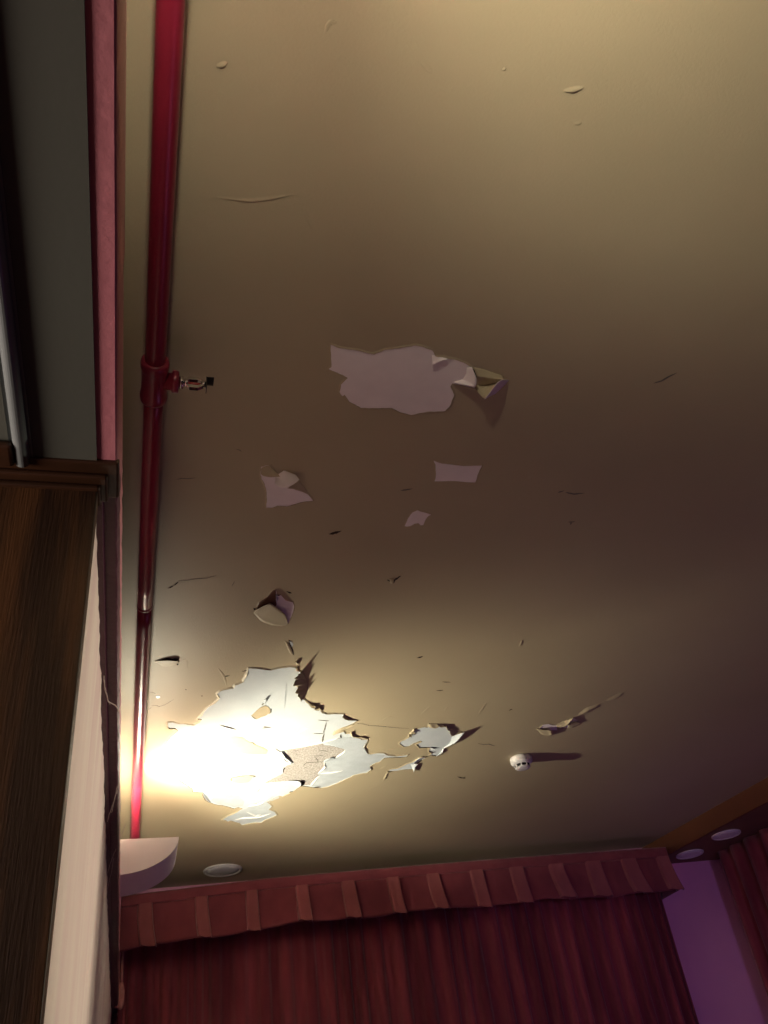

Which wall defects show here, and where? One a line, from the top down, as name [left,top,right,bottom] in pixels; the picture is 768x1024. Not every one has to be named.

peeling [327,343,509,416]
peeling [259,464,314,509]
peeling [433,460,483,483]
peeling [404,509,432,527]
peeling [254,589,295,626]
peeling [155,658,179,666]
peeling [159,665,465,825]
peeling [536,718,581,736]